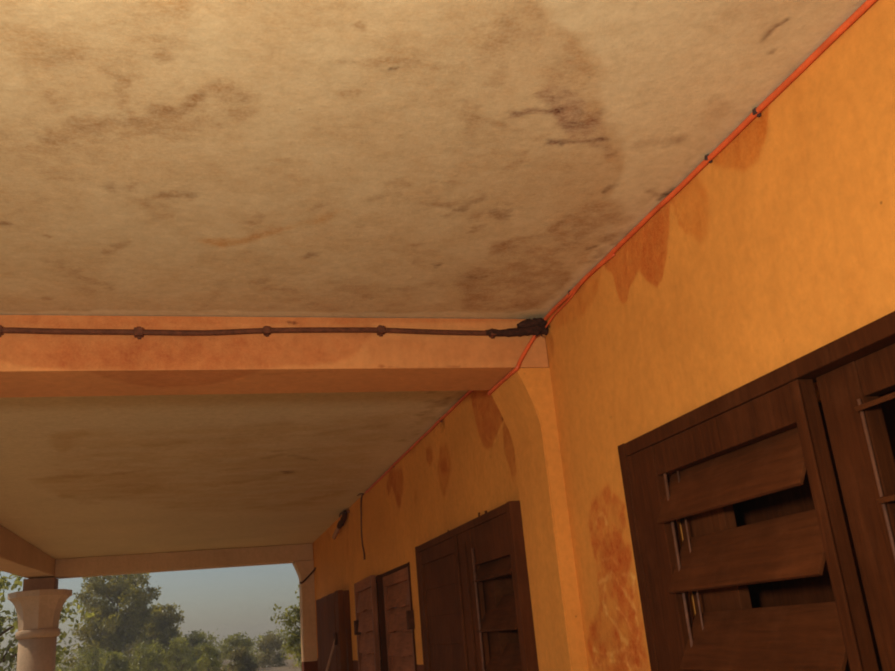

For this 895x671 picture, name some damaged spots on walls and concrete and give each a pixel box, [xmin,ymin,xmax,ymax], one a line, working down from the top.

water stain [0,0,742,389]
water stain [709,101,774,178]
water stain [22,390,517,514]